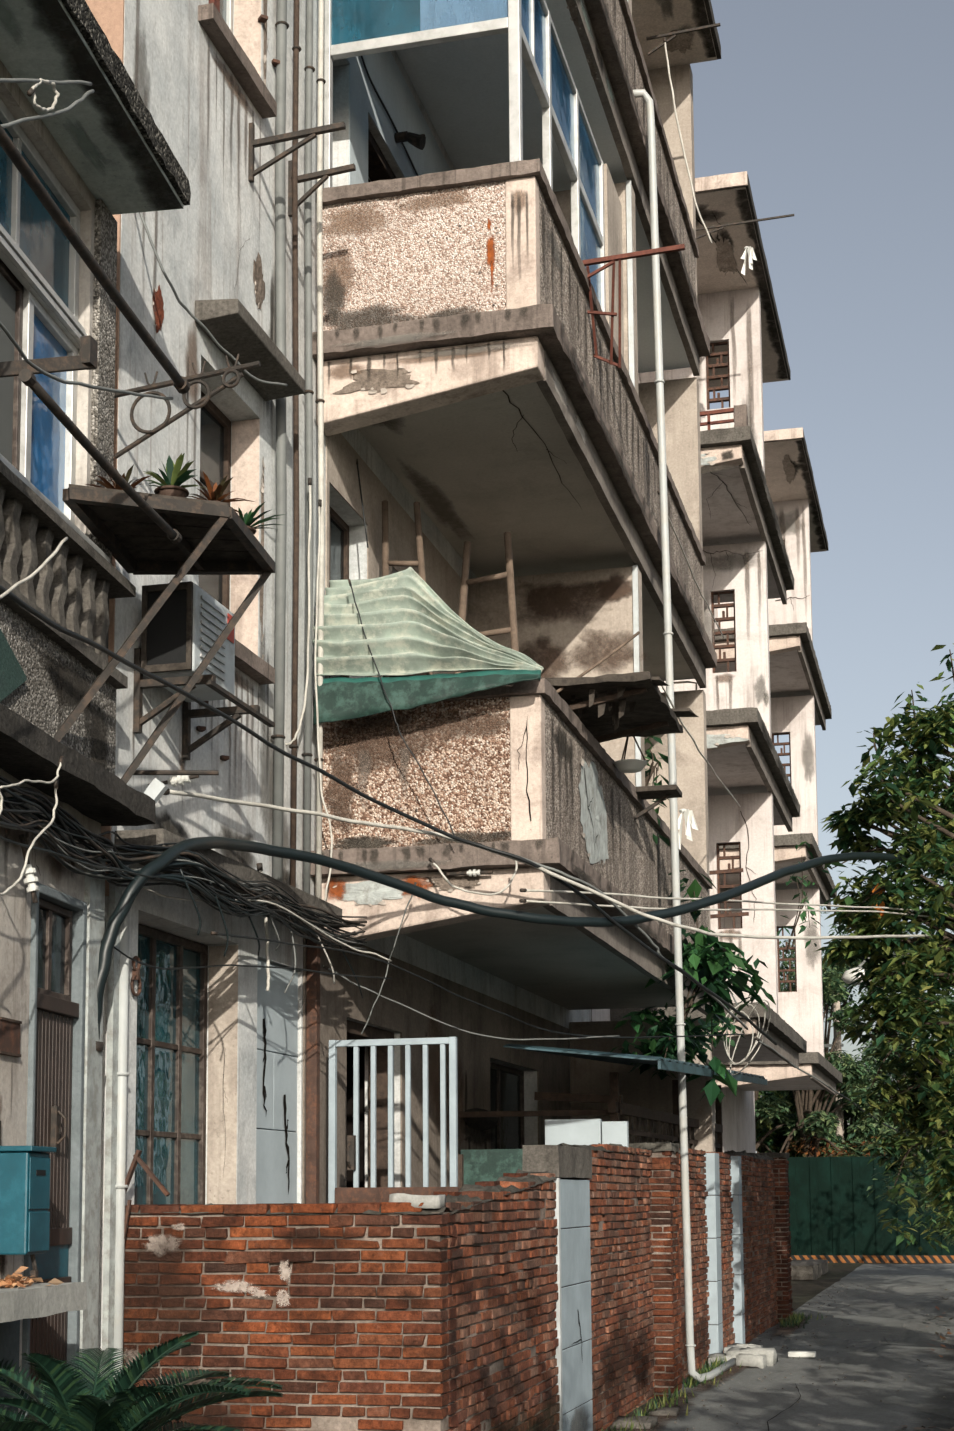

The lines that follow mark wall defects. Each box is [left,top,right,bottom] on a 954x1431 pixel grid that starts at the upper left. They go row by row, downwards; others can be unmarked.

leakage [683,0,716,58]
leakage [577,0,699,313]
leakage [329,210,382,232]
corrosion [487,218,495,286]
leakage [313,256,507,378]
peeling [332,366,419,394]
crack [503,390,582,509]
crack [517,724,531,821]
peeling [578,757,609,864]
peeling [327,880,404,906]
crack [263,1018,290,1194]
crack [767,1350,810,1431]